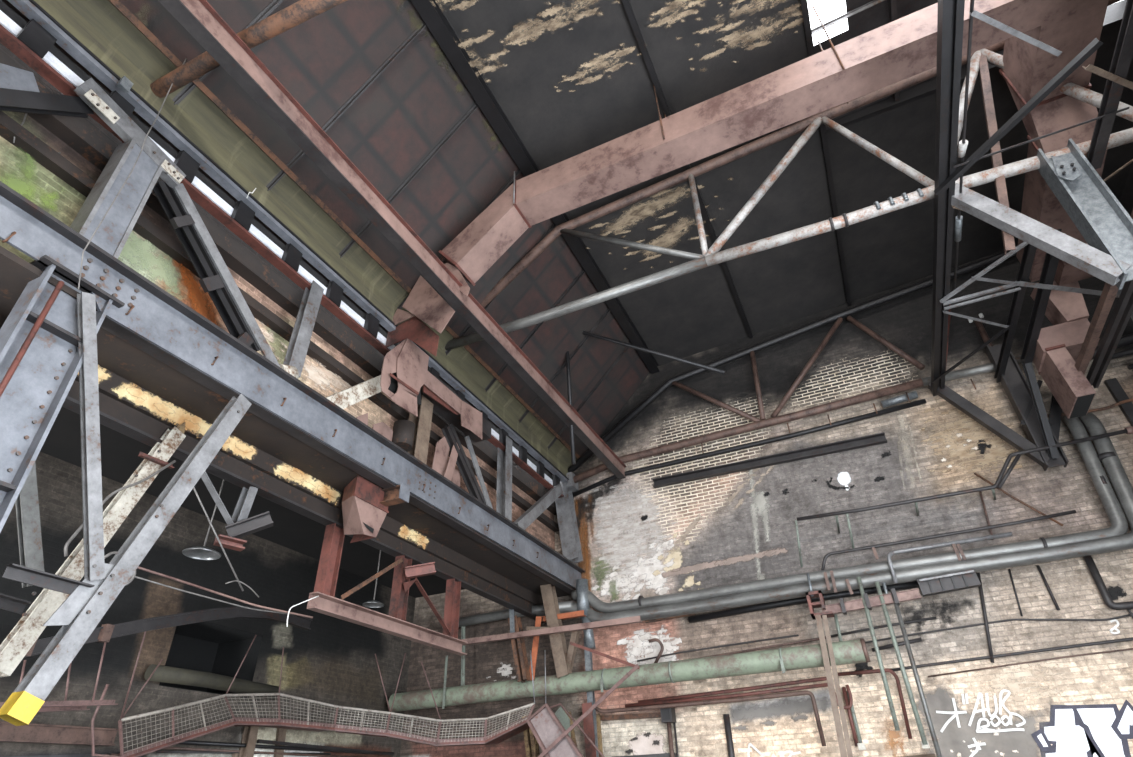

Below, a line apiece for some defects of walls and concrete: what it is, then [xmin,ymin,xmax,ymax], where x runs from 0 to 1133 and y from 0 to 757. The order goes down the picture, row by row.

rust [172,261,218,326]
peeling [98,365,212,436]
peeling [222,436,256,460]
peeling [274,464,340,505]
peeling [586,397,789,603]
peeling [617,625,682,665]